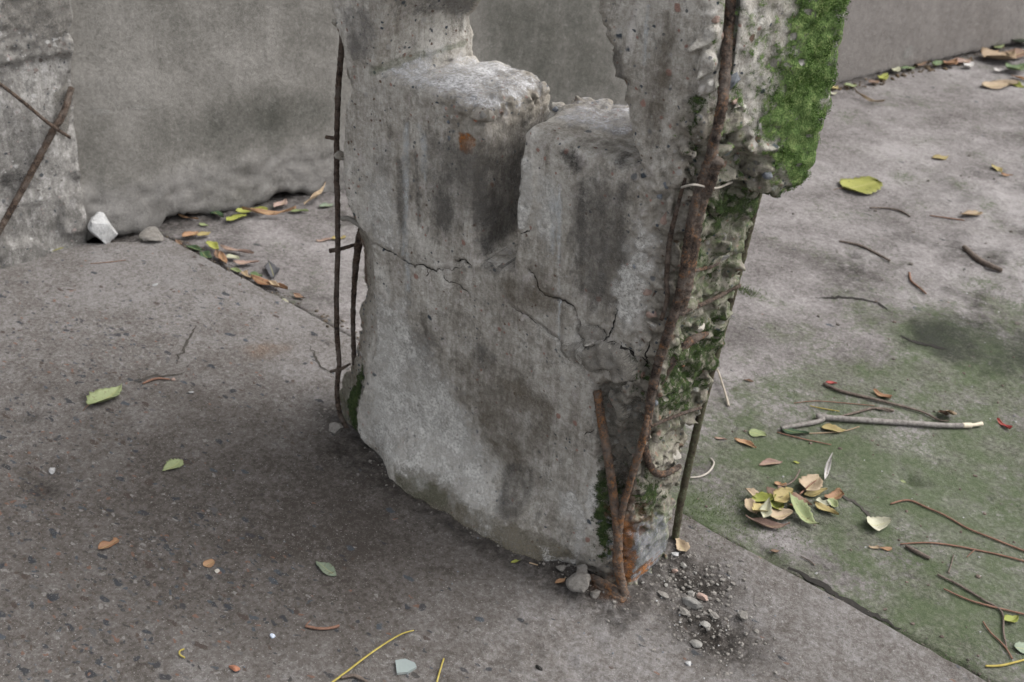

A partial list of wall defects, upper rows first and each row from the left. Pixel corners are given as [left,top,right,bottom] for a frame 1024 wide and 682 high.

crack [375,244,472,298]
leakage [425,110,549,273]
crack [513,269,650,386]
leakage [574,179,654,333]
spalling [560,0,762,597]
leakage [362,288,574,561]
corrosion [611,518,659,582]